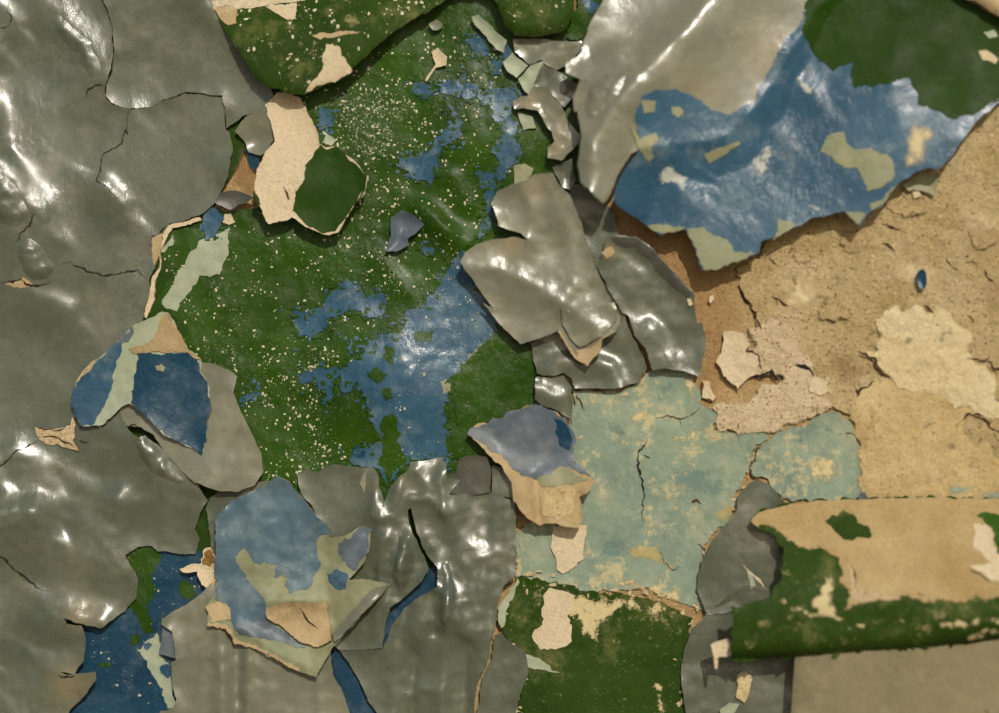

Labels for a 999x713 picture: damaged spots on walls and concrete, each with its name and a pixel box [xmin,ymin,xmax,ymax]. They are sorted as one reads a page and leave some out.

peeling [425,48,447,81]
crack [96,112,129,196]
peeling [215,92,369,235]
peeling [460,15,706,377]
crack [2,279,47,287]
crack [62,261,146,278]
peeling [71,312,263,492]
crack [658,383,714,423]
spalling [712,317,833,435]
crack [0,442,35,467]
peeling [447,375,594,528]
crack [637,441,649,521]